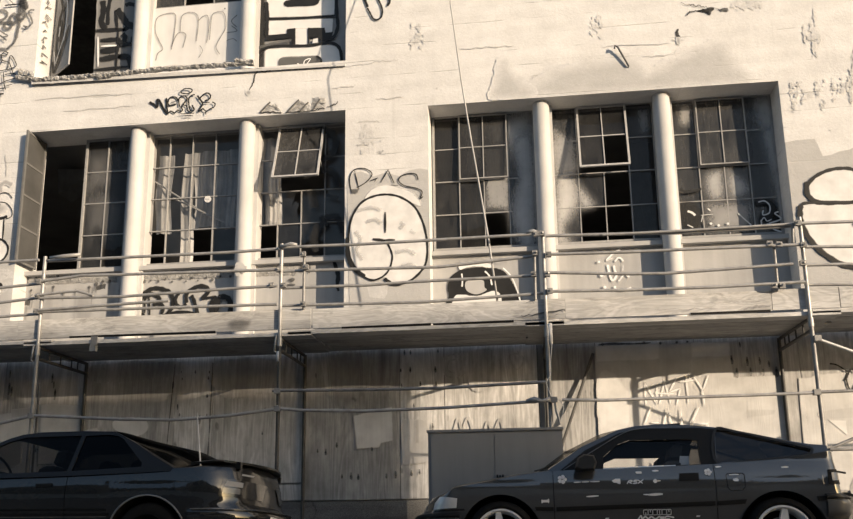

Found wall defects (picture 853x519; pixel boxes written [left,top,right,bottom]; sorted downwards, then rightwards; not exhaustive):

crack [605,29,684,57]